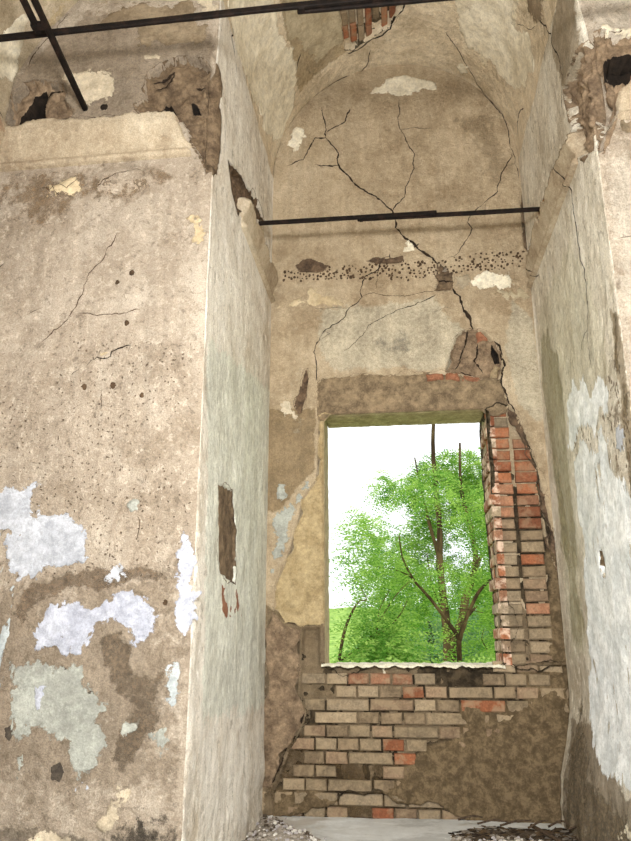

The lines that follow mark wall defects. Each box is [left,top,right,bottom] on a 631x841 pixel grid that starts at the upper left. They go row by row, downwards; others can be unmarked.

peeling [100,0,402,174]
crack [273,5,524,264]
crack [43,233,137,341]
crack [72,344,131,374]
crack [313,255,473,380]
crack [494,341,515,412]
peeling [3,563,159,791]
flaking render [217,482,242,618]
flaking render [263,402,570,824]
peeling [567,376,631,791]
water stain [111,814,177,841]
water stain [563,703,631,841]